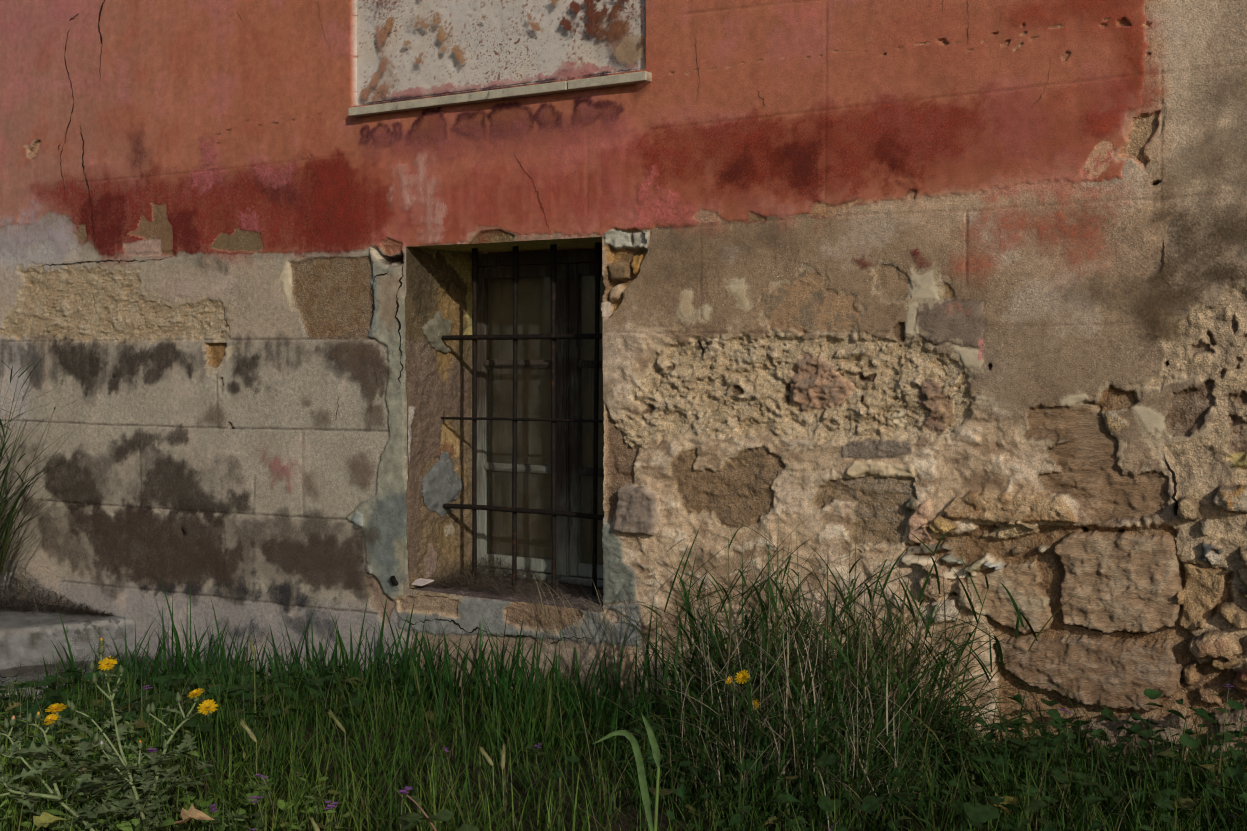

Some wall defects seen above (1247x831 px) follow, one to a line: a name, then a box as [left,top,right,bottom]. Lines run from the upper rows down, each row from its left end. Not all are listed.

water stain [1,335,206,396]
crack [39,0,170,267]
spalling [0,265,241,368]
peeling [123,201,173,257]
water stain [228,338,301,392]
water stain [0,78,624,271]
peeling [360,0,644,102]
spalling [601,229,650,320]
spalling [615,264,983,479]
water stain [1131,171,1247,338]
water stain [21,424,377,639]
spalling [901,284,1247,768]